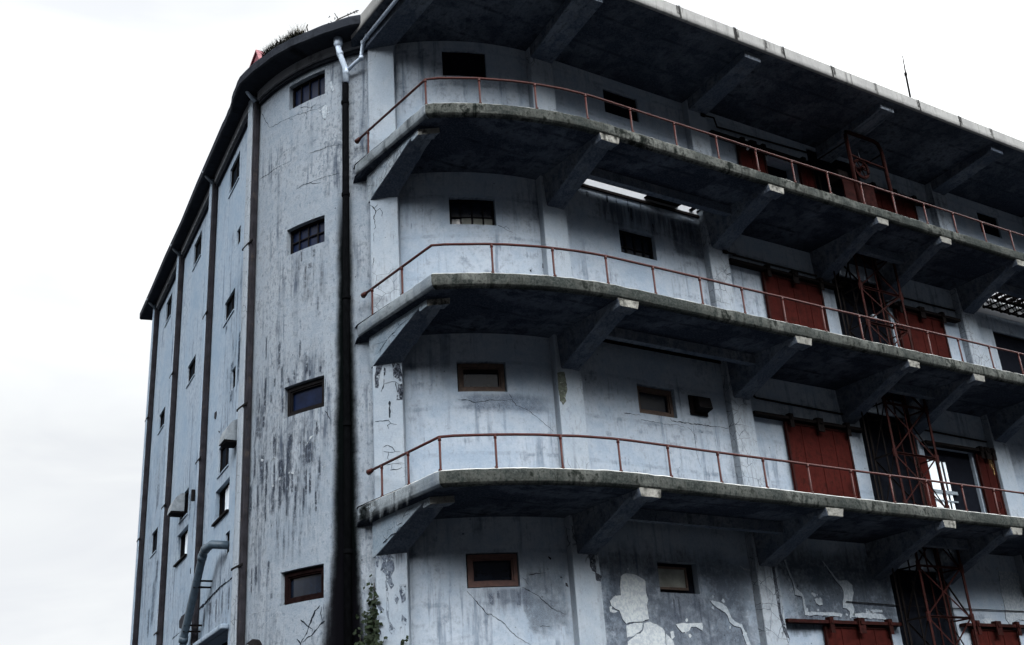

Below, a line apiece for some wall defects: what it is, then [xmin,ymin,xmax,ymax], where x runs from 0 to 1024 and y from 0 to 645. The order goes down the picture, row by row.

leakage [603,196,696,238]
leakage [249,338,321,531]
leakage [323,218,375,645]
peeling [375,363,404,400]
crack [462,394,553,431]
crack [467,572,562,644]
peeling [610,568,703,645]
peeling [710,595,751,645]